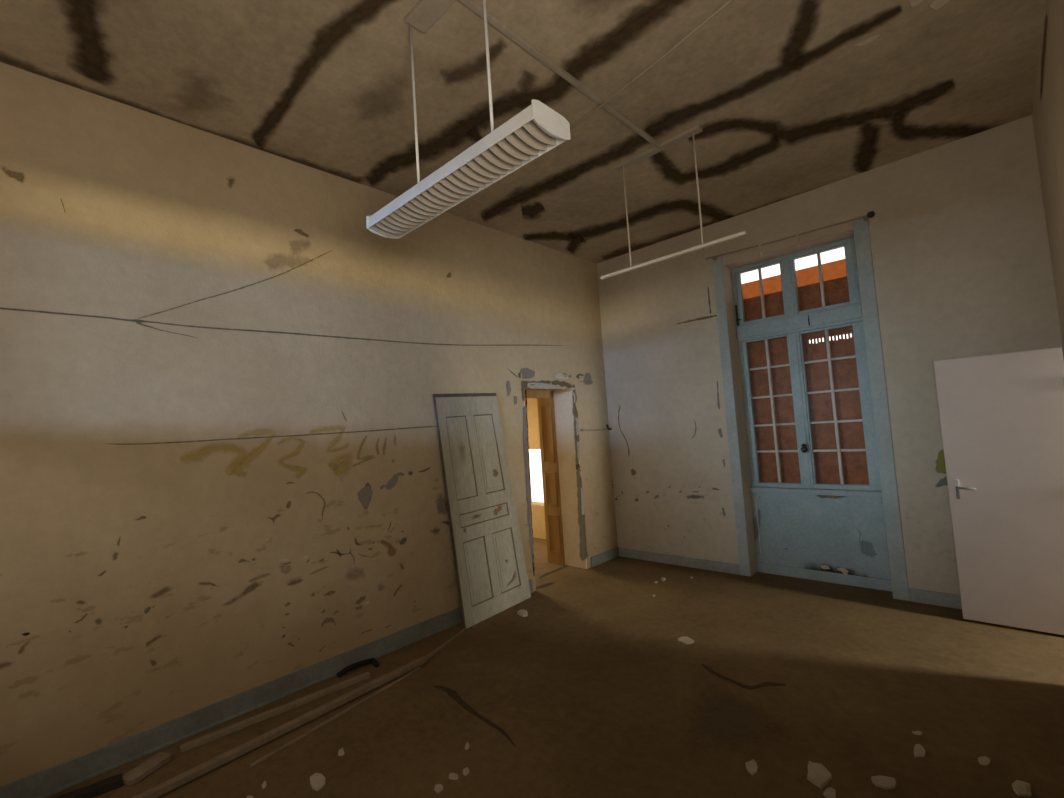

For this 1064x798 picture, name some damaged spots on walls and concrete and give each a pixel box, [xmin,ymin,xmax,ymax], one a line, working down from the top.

water stain [0,0,685,185]
water stain [482,0,992,221]
crack [1039,15,1047,99]
water stain [523,198,787,259]
crack [0,251,501,346]
spalling [358,467,431,509]
spalling [506,368,593,575]